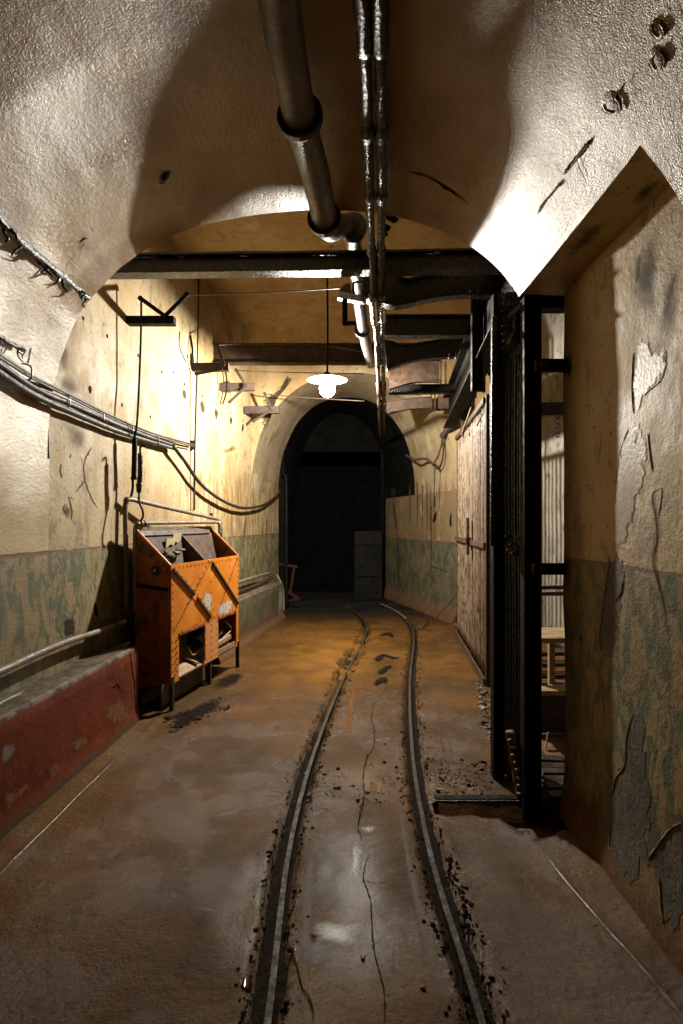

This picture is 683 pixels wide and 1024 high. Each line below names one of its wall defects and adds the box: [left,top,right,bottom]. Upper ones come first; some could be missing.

crack [537,139,592,214]
peeling [599,340,666,657]
crack [357,703,389,1021]
spalling [607,712,683,932]